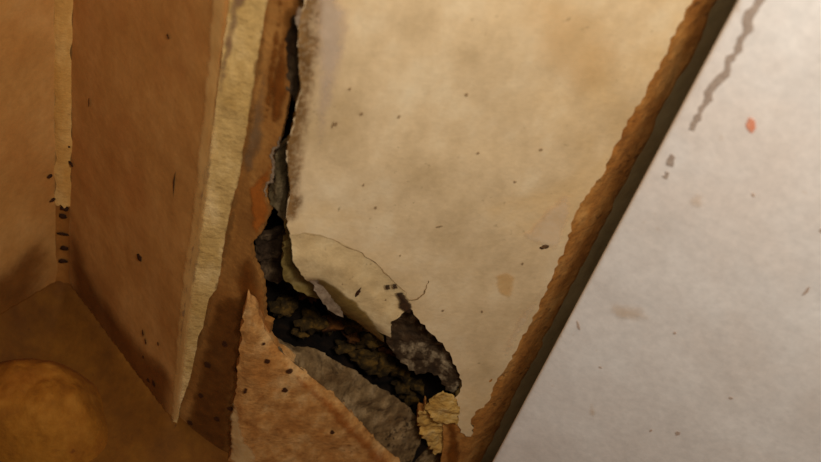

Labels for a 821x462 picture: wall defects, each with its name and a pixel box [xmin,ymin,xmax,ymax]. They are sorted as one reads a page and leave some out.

crack [285,0,304,101]
leakage [286,0,339,219]
crack [264,137,290,221]
spalling [253,0,717,462]
peeling [231,409,255,462]